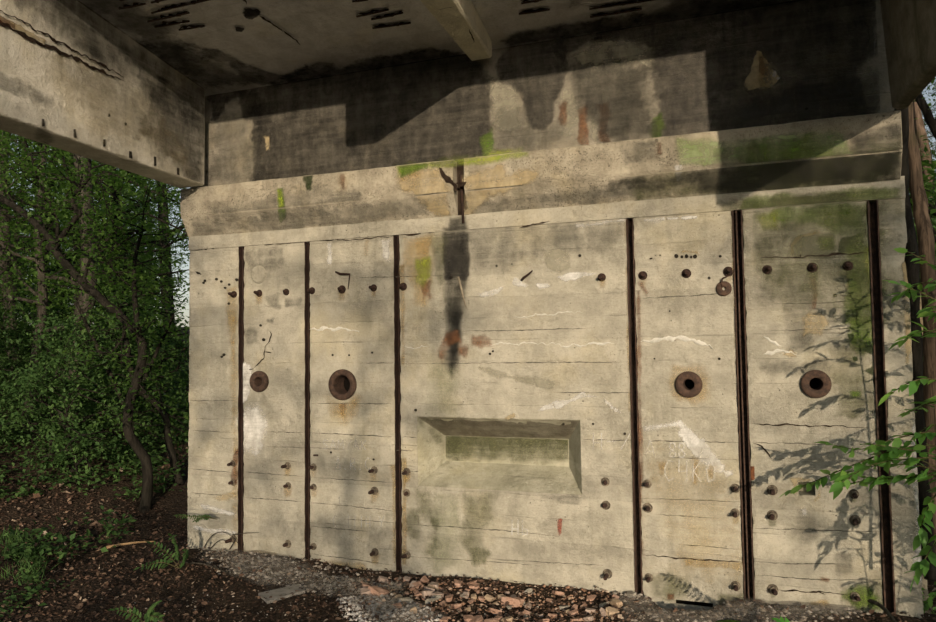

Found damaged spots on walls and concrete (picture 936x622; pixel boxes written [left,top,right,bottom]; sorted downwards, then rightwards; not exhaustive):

crack [0,10,124,81]
leakage [32,0,490,181]
leakage [497,0,877,145]
spalling [745,51,780,90]
leakage [612,125,901,211]
leakage [434,219,469,375]
leakage [653,420,733,476]